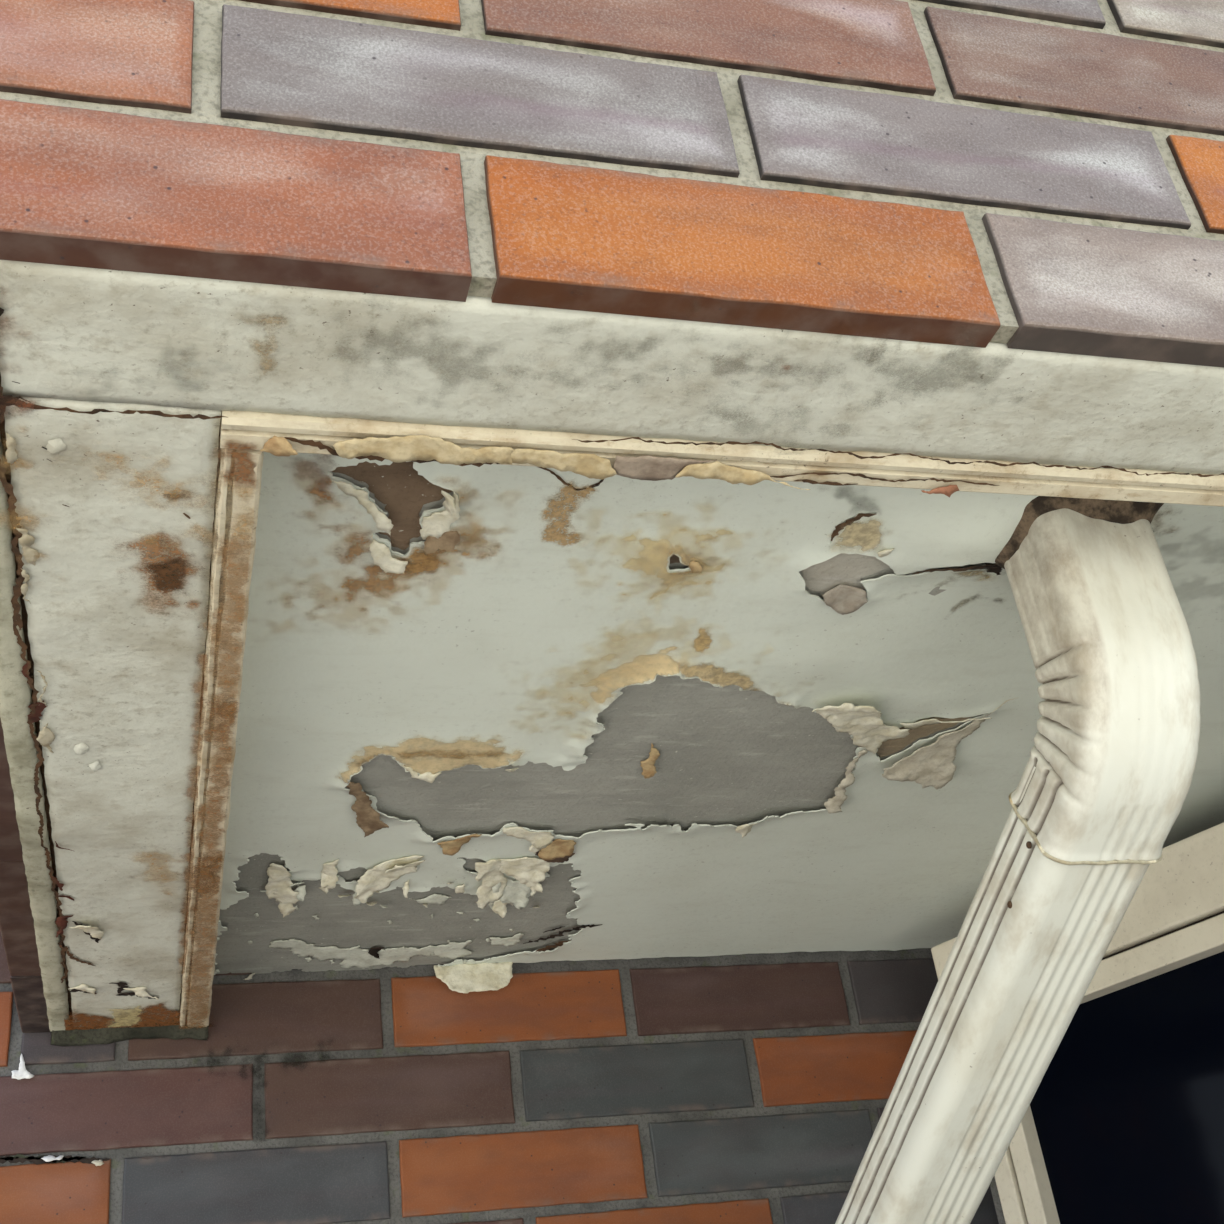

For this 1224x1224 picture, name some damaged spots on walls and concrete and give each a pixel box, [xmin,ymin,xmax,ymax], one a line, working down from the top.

crack [0,381,225,424]
rust [135,474,190,500]
rust [214,442,256,498]
peeling [260,435,856,574]
crack [572,437,1224,551]
spalling [921,485,960,498]
peeling [801,548,895,615]
crack [912,563,1002,575]
water stain [591,628,756,703]
crack [0,459,159,999]
rust [64,517,253,1030]
peeling [215,675,1016,993]